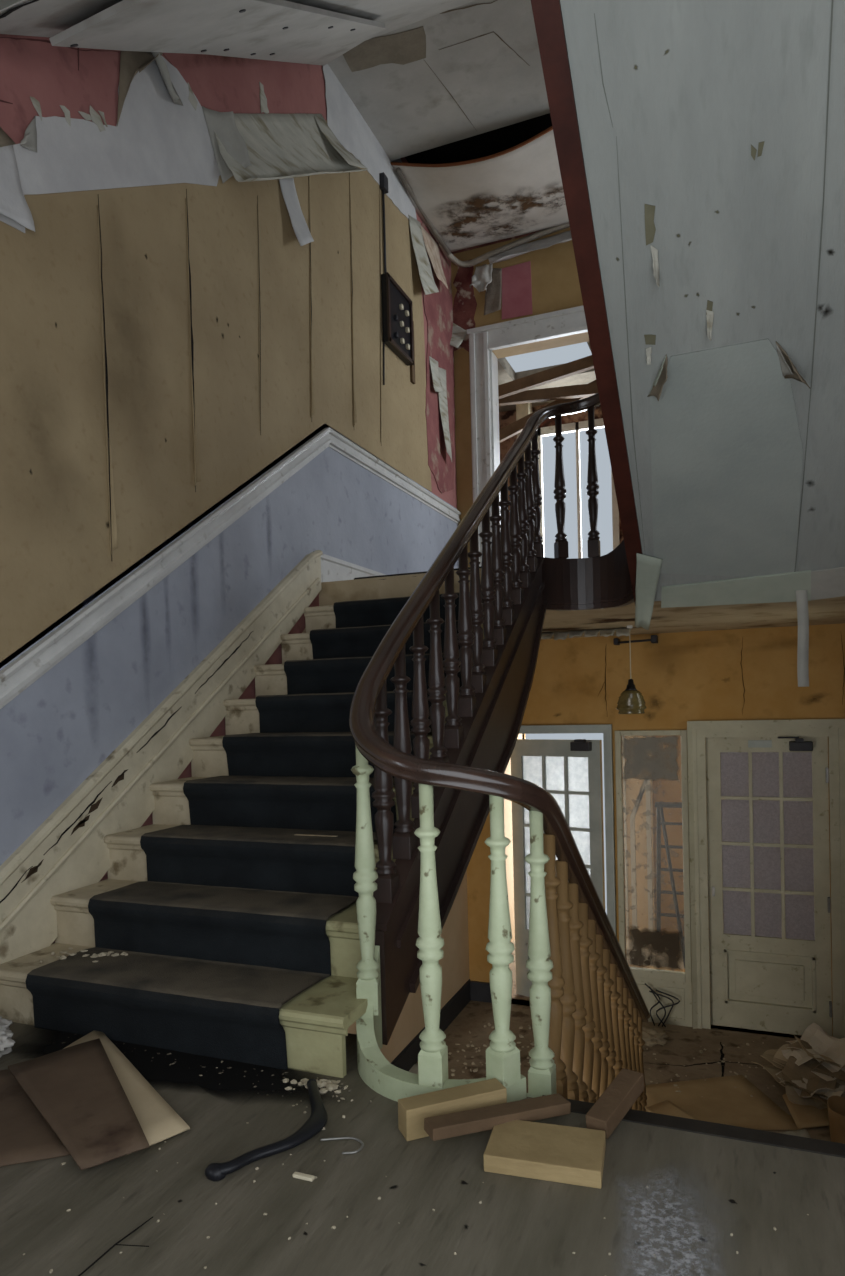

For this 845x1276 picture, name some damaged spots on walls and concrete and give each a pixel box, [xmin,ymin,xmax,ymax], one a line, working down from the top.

peeling [0,34,121,144]
peeling [163,53,323,116]
spalling [343,26,521,131]
peeling [751,141,764,161]
leakage [442,188,565,238]
peeling [645,204,660,288]
peeling [408,215,533,493]
peeling [644,335,656,365]
crack [0,631,253,903]